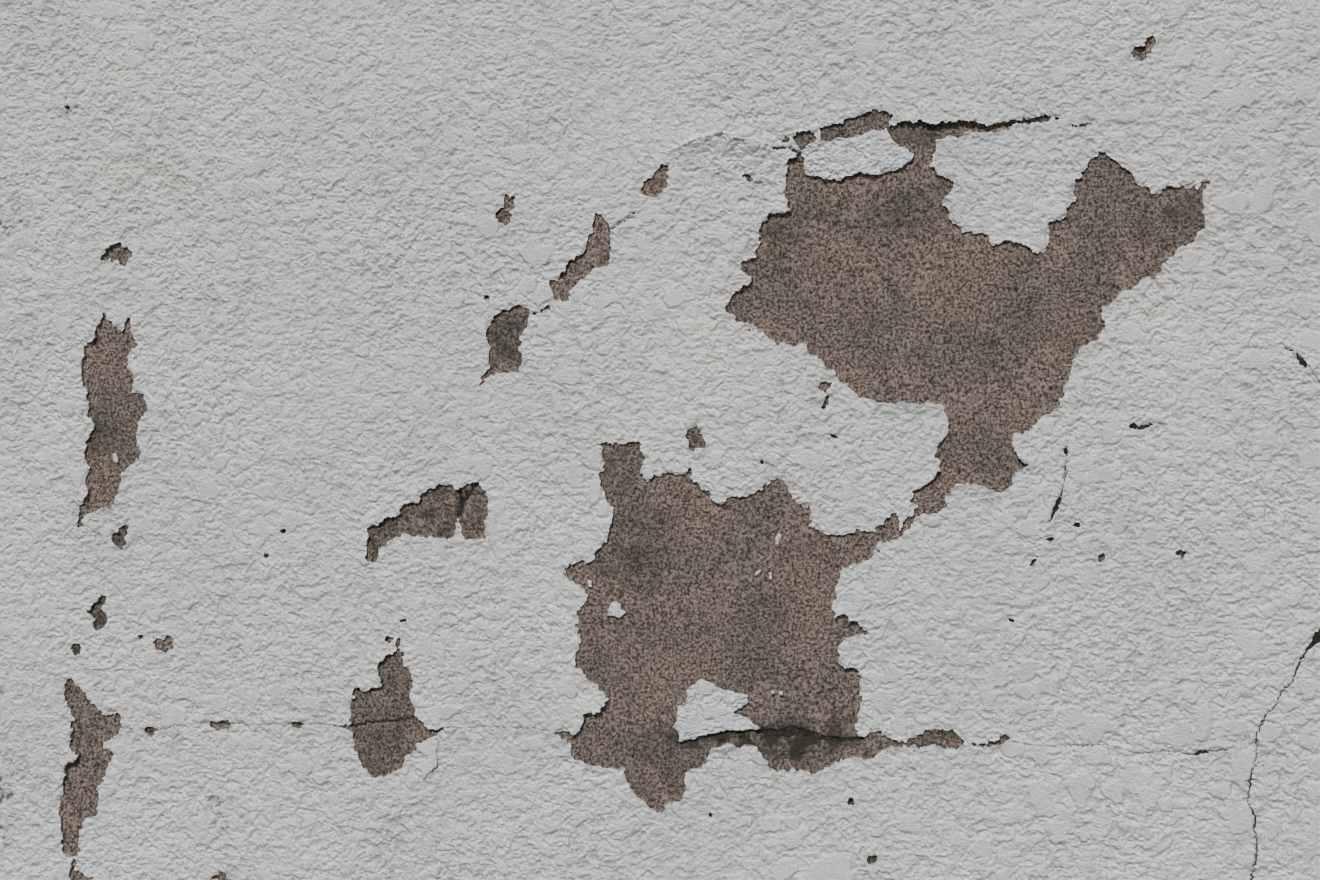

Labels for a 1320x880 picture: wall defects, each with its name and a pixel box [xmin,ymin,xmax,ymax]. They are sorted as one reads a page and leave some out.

spalling [77,313,148,528]
spalling [100,242,132,266]
spalling [365,482,488,563]
spalling [479,213,611,386]
spalling [554,109,1210,813]
crack [1049,449,1068,522]
crack [1133,422,1161,430]
crack [1285,347,1320,382]
spalling [58,678,122,880]
spalling [343,619,444,779]
crack [1052,629,1320,880]